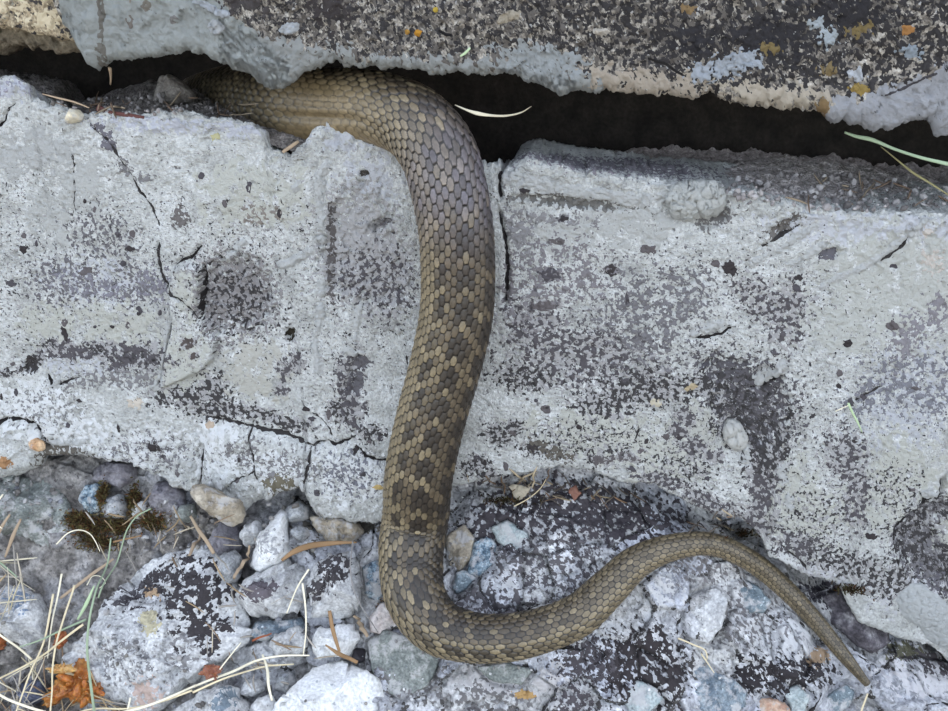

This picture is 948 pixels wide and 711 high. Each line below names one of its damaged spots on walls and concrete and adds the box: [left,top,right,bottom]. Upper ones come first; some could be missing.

crack [648,57,684,76]
crack [885,73,938,96]
crack [90,123,209,317]
crack [48,374,79,388]
crack [0,416,46,441]
crack [893,479,941,566]